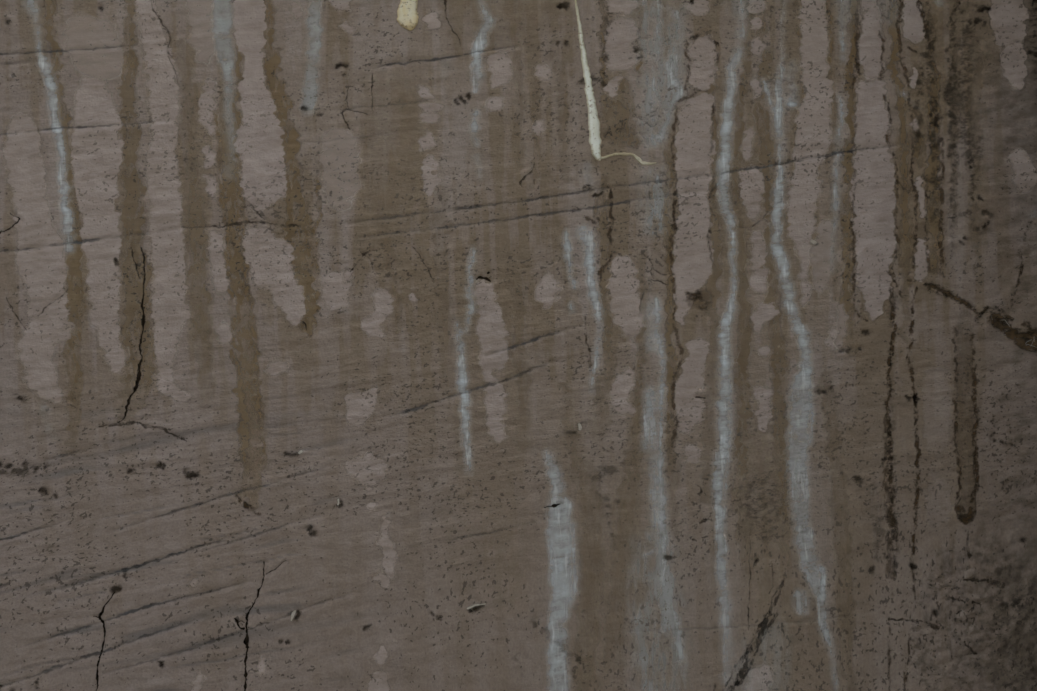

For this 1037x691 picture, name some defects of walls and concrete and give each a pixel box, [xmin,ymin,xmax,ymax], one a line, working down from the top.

damp [38,0,86,410]
damp [117,0,158,396]
crack [99,247,187,442]
damp [212,0,267,471]
damp [262,0,323,336]
damp [457,334,471,464]
damp [599,11,683,658]
damp [705,12,813,578]
damp [824,0,858,339]
crack [93,593,114,691]
crack [234,561,284,691]
damp [548,463,576,691]